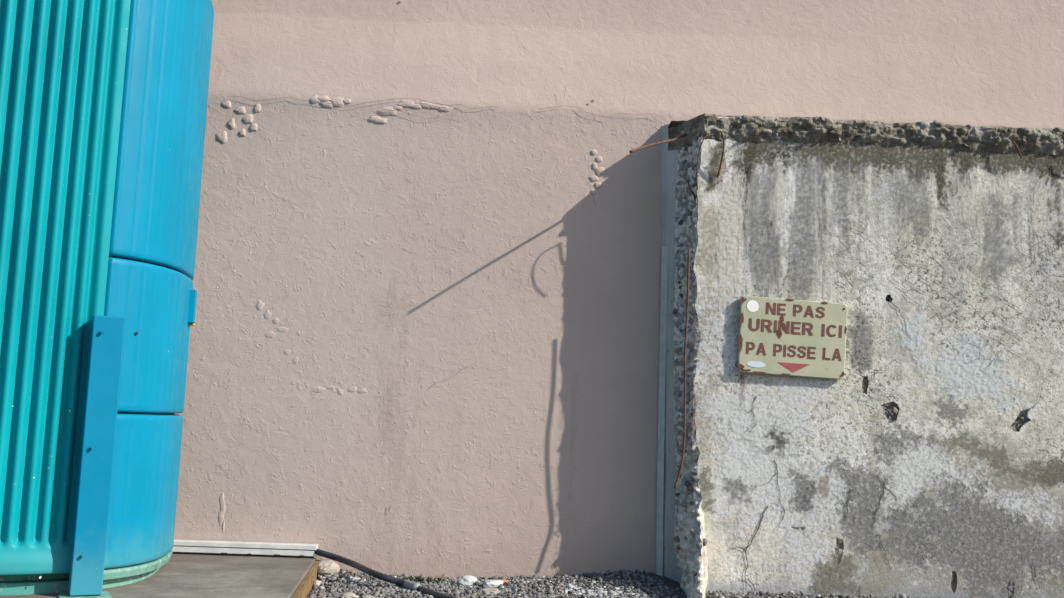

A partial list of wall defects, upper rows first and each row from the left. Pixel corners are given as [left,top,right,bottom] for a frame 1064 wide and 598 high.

water stain [706,139,1064,321]
water stain [848,310,875,372]
water stain [697,466,757,512]
crack [718,396,820,591]
water stain [788,468,816,511]
water stain [811,395,1064,598]